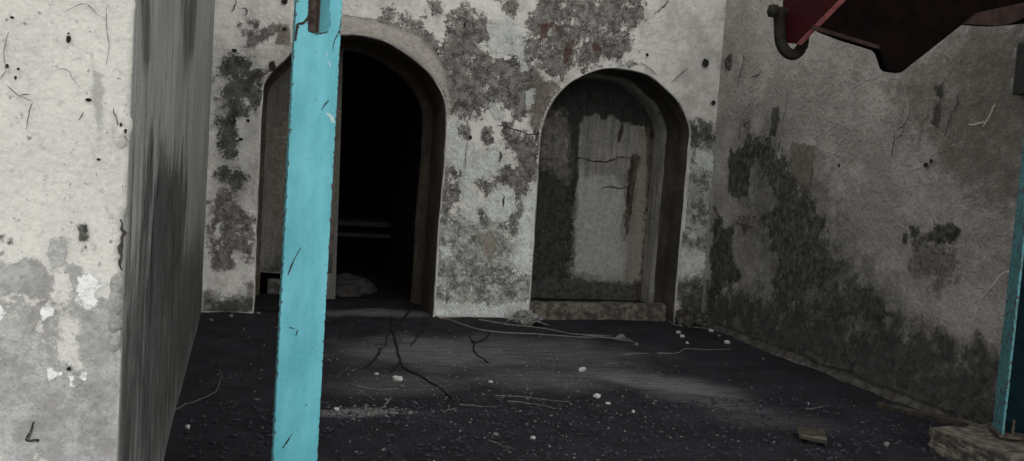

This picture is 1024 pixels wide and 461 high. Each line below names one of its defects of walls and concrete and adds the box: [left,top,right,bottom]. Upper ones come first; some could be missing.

peeling [0,223,113,461]
damp [65,16,283,461]
damp [436,105,639,315]
crack [573,154,635,190]
damp [677,106,999,425]